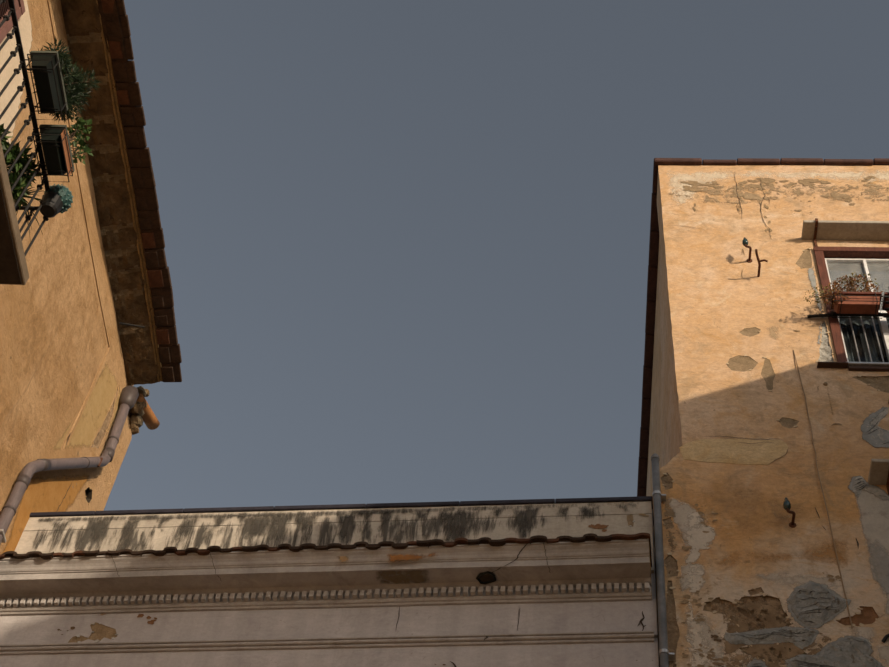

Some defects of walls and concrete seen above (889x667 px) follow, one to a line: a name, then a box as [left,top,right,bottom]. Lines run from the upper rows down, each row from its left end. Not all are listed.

flaking render [668,176,889,232]
flaking render [739,327,761,337]
flaking render [726,355,775,392]
flaking render [776,417,799,429]
leakage [2,475,504,554]
leakage [508,505,545,538]
flaking render [661,473,831,667]
flaking render [58,613,118,643]
flaking render [836,606,879,627]